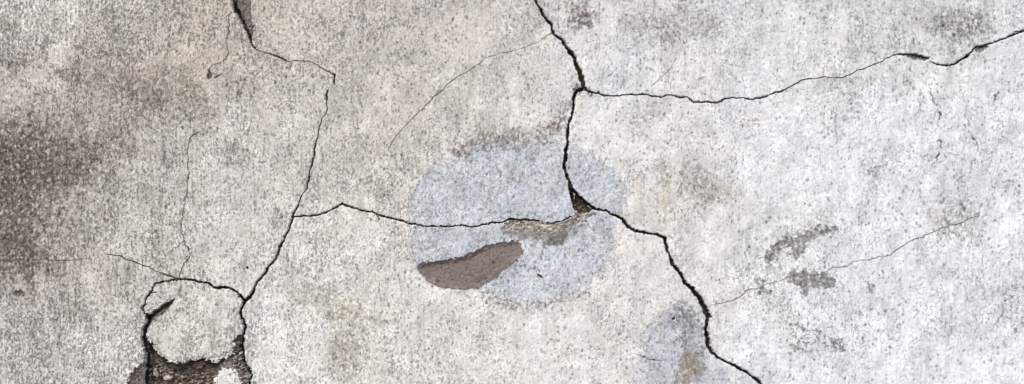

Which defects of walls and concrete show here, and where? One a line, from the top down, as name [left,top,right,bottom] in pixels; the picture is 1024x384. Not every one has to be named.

crack [931,30,1024,67]
crack [930,92,979,161]
crack [108,0,927,384]
peeling [406,135,630,310]
crack [713,215,978,305]
flaking render [150,300,174,322]
flaking render [128,335,252,384]